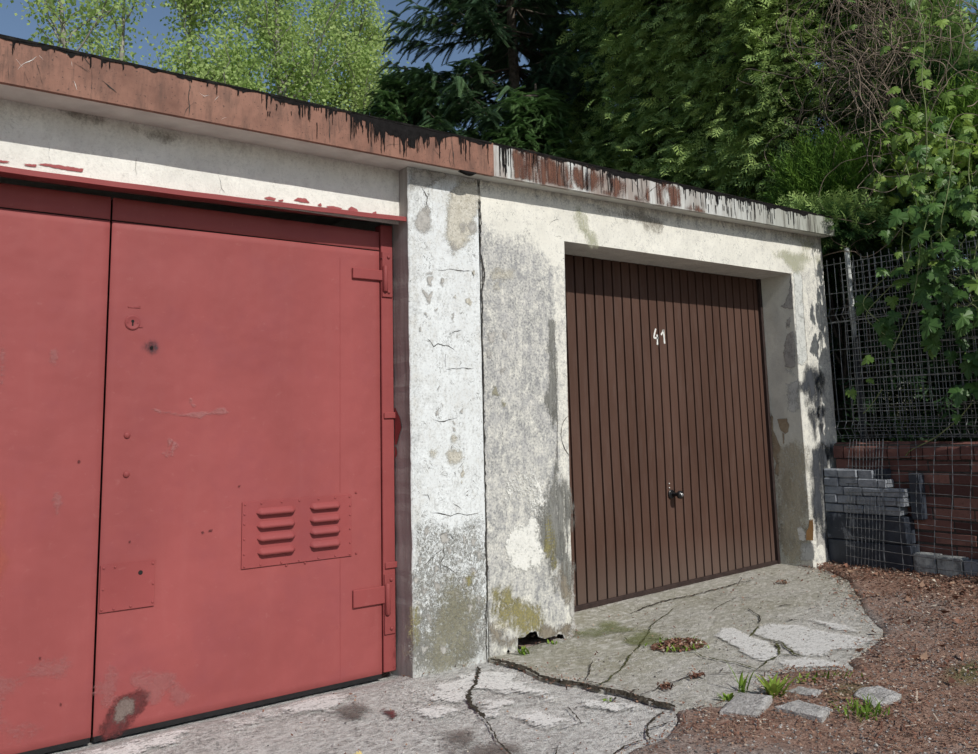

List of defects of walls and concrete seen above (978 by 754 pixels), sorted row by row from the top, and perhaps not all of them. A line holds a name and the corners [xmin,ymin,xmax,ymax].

peeling [415,206,432,233]
flaking render [445,179,481,254]
corrosion [512,150,702,212]
damp [544,320,558,428]
flaking render [777,275,800,443]
crack [421,179,804,754]
damp [776,387,833,563]
damp [492,587,513,608]
damp [489,623,517,646]